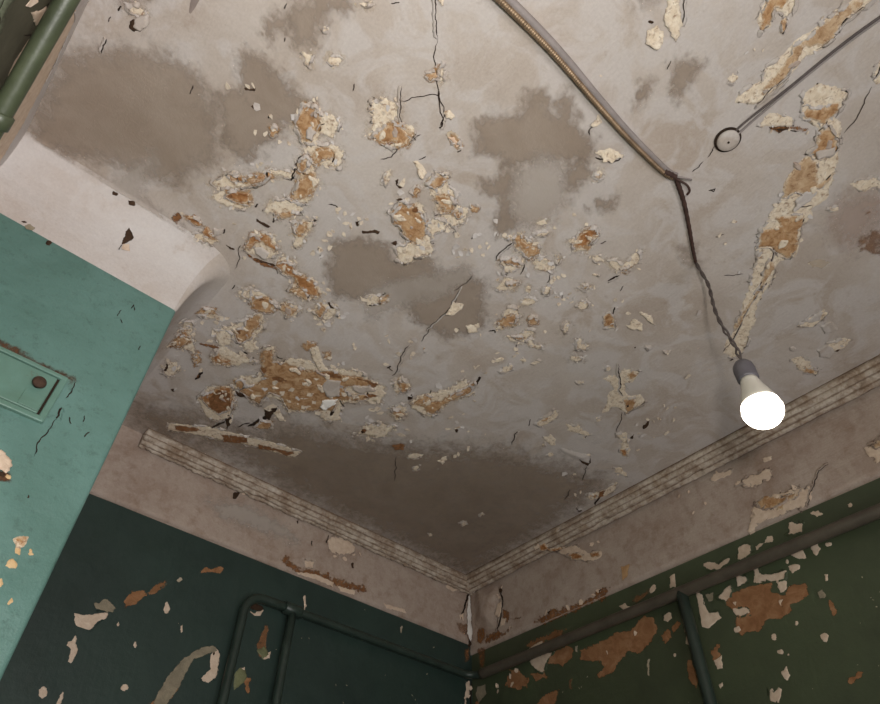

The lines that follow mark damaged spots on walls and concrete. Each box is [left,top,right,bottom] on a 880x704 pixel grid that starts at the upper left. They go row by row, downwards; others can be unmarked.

corrosion [0,340,76,380]
water stain [32,50,314,186]
water stain [324,237,484,336]
spalling [159,96,655,481]
crack [383,0,447,160]
crack [389,275,473,376]
water stain [475,90,592,234]
spalling [723,83,852,361]
water stain [145,407,594,571]
peeling [67,599,115,663]
peeling [151,646,220,704]
peeling [695,542,837,636]